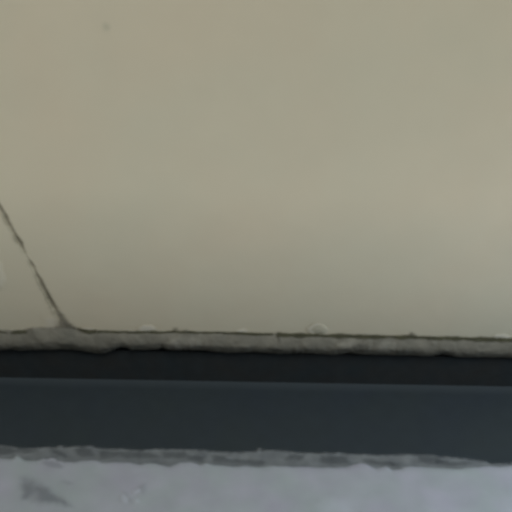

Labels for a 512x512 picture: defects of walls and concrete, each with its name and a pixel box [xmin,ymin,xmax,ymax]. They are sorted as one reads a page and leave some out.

crack [0,204,512,343]